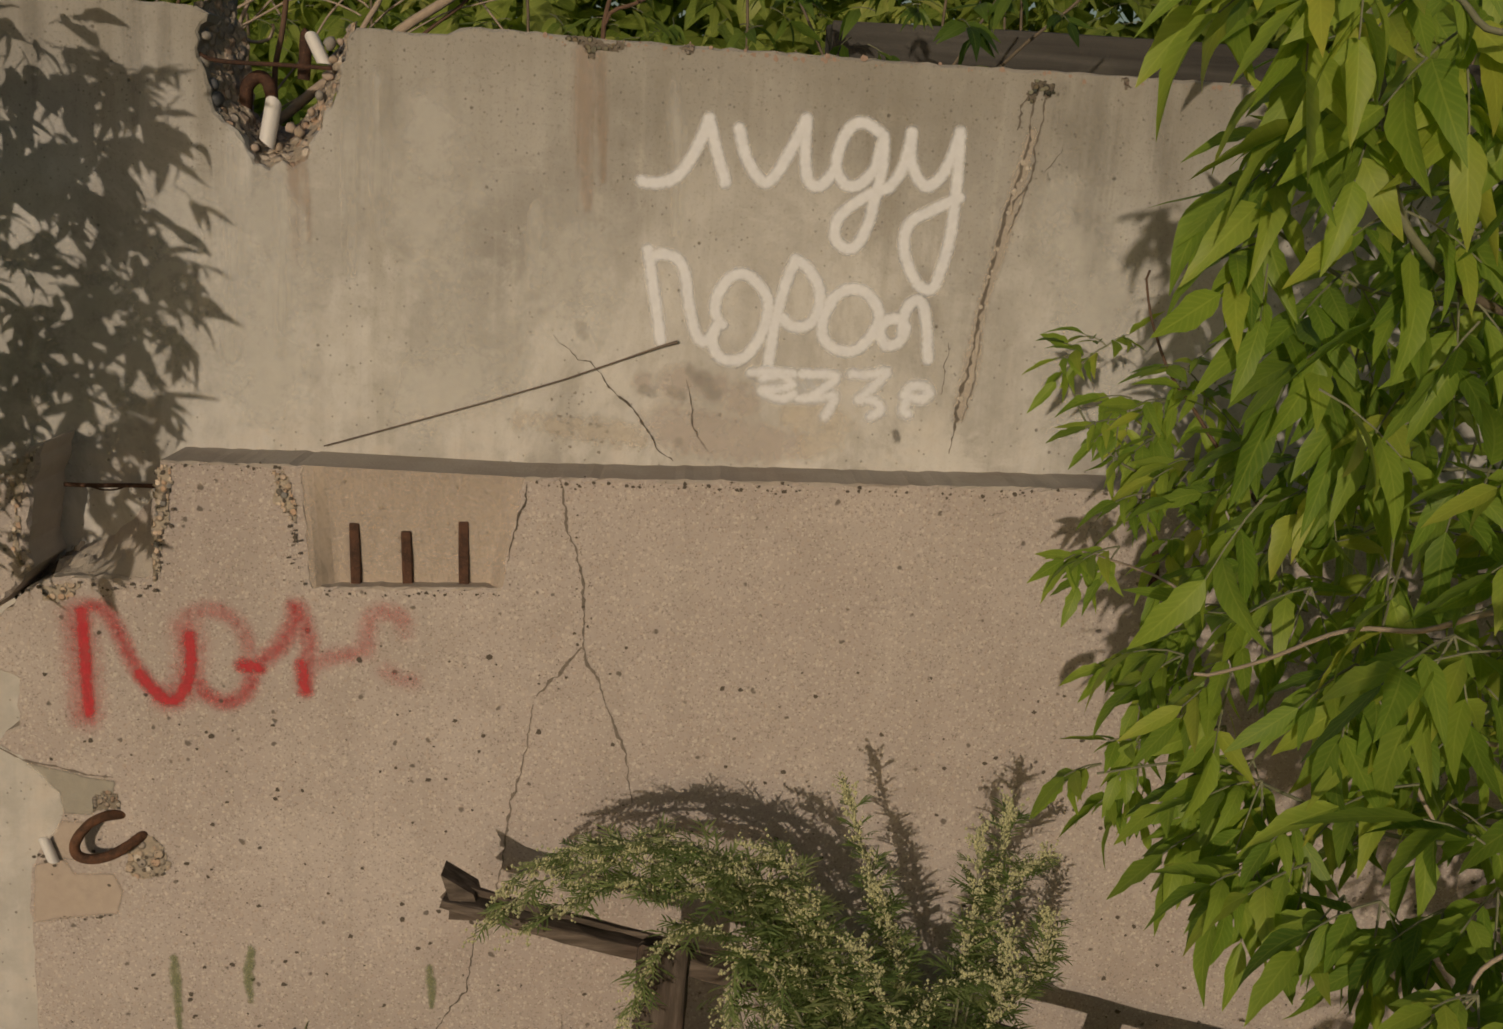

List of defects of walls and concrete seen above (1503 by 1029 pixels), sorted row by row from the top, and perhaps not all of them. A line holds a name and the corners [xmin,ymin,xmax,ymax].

spalling [193,0,357,169]
crack [941,91,1063,452]
crack [554,336,710,461]
spalling [25,462,306,602]
crack [495,480,632,890]
peeling [0,748,195,922]
crack [436,923,477,1029]